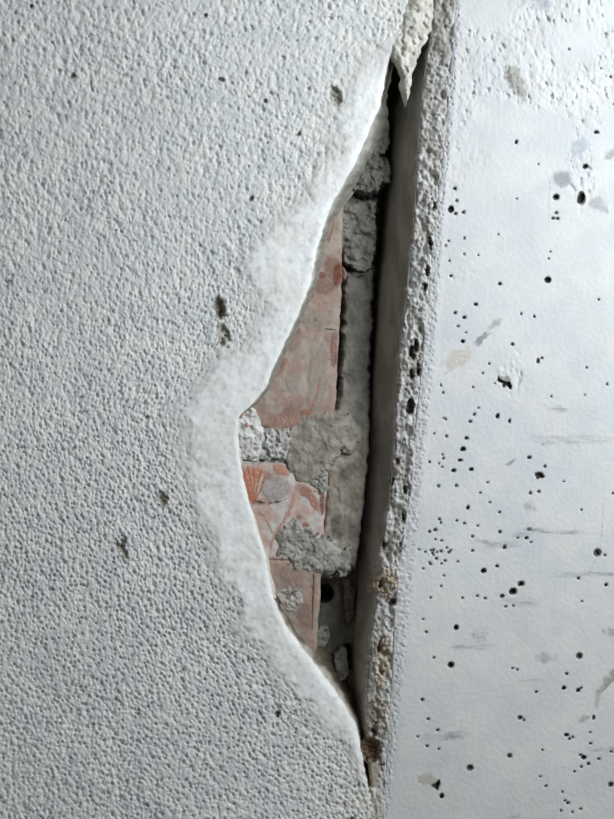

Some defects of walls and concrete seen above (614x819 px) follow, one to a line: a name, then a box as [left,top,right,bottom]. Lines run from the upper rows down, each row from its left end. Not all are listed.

spalling [168,0,434,793]